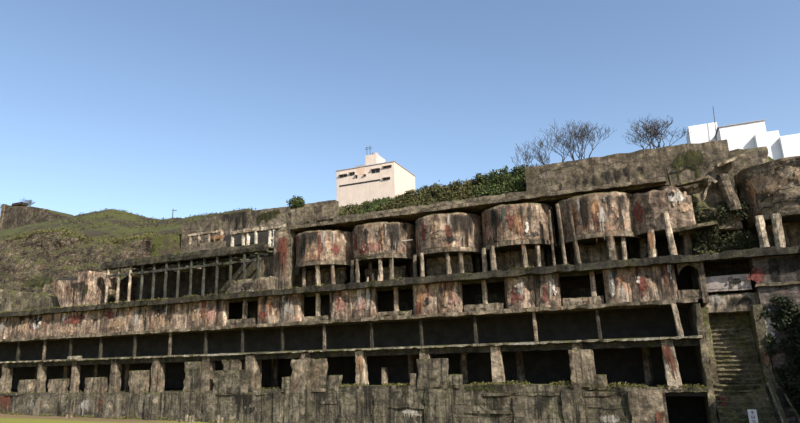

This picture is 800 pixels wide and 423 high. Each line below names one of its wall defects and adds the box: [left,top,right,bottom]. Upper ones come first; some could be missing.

rust [590,200,600,239]
rust [416,284,429,321]
leakage [234,387,252,414]
leakage [316,385,328,417]
leakage [363,385,373,423]
leakage [534,391,550,423]